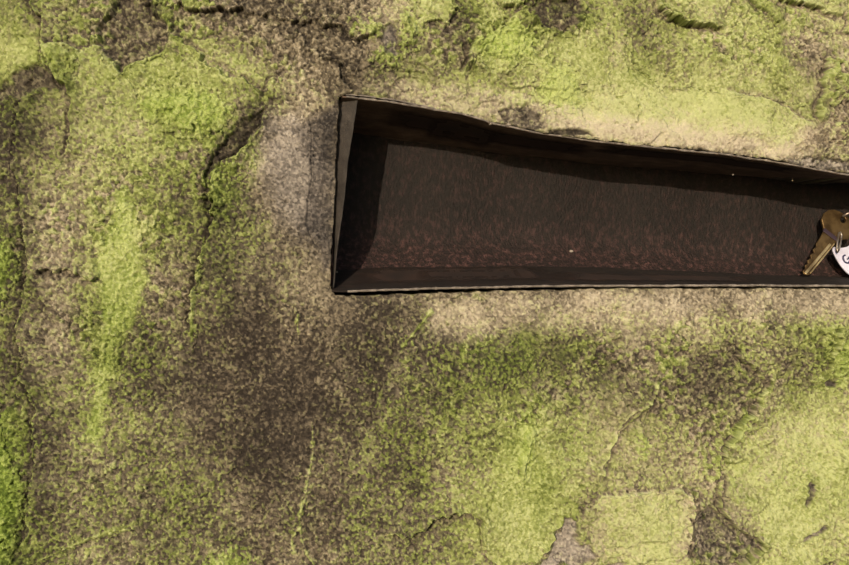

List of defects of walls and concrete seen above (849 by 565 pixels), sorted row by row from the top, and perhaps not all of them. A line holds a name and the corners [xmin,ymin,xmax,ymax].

crack [296,113,326,256]
flaking render [378,476,849,565]